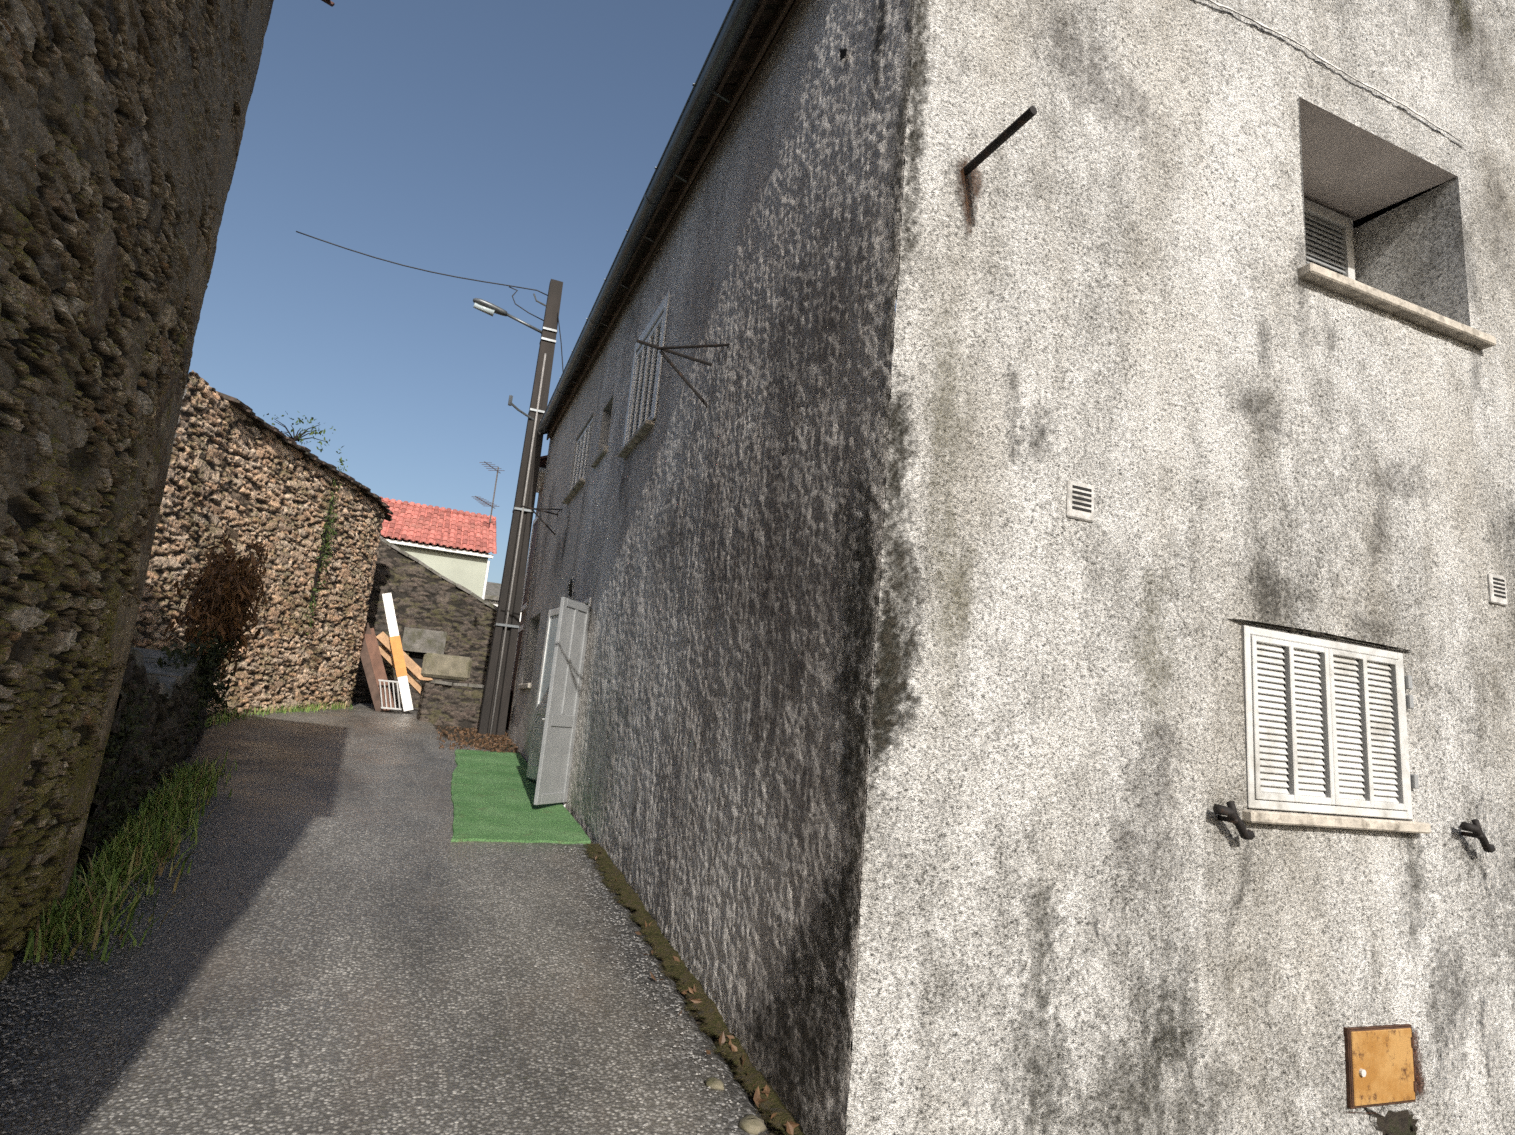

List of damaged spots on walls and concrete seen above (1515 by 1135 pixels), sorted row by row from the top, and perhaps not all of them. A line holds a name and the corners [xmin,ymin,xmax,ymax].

water stain [1453,0,1473,65]
corrosion [959,158,982,232]
water stain [834,0,930,1097]
water stain [1097,911,1124,938]
spalling [1365,1105,1422,1135]